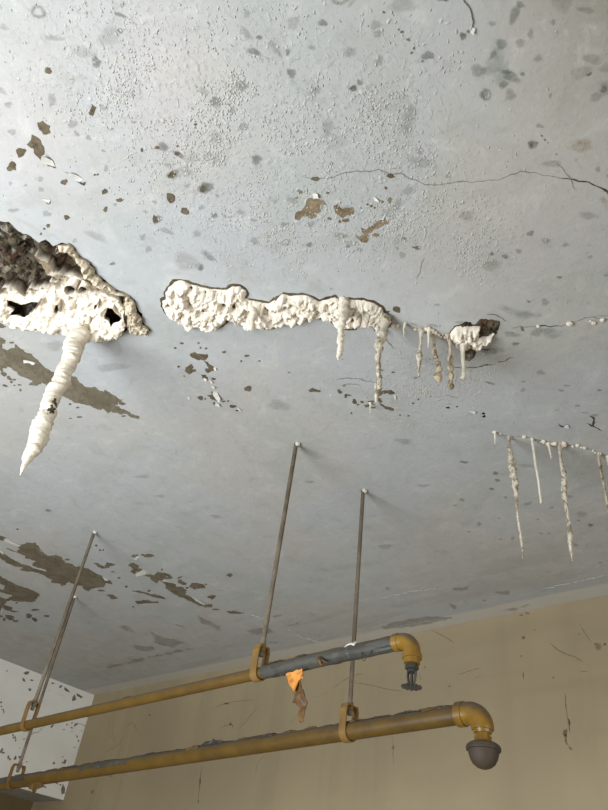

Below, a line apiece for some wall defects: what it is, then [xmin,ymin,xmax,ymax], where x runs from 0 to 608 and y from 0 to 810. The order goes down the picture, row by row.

peeling [6,121,55,171]
peeling [60,172,85,185]
crack [303,164,608,194]
spalling [0,221,150,336]
peeling [0,323,54,392]
leakage [0,247,126,475]
leakage [160,279,513,402]
peeling [62,376,139,419]
peeling [0,773,46,796]